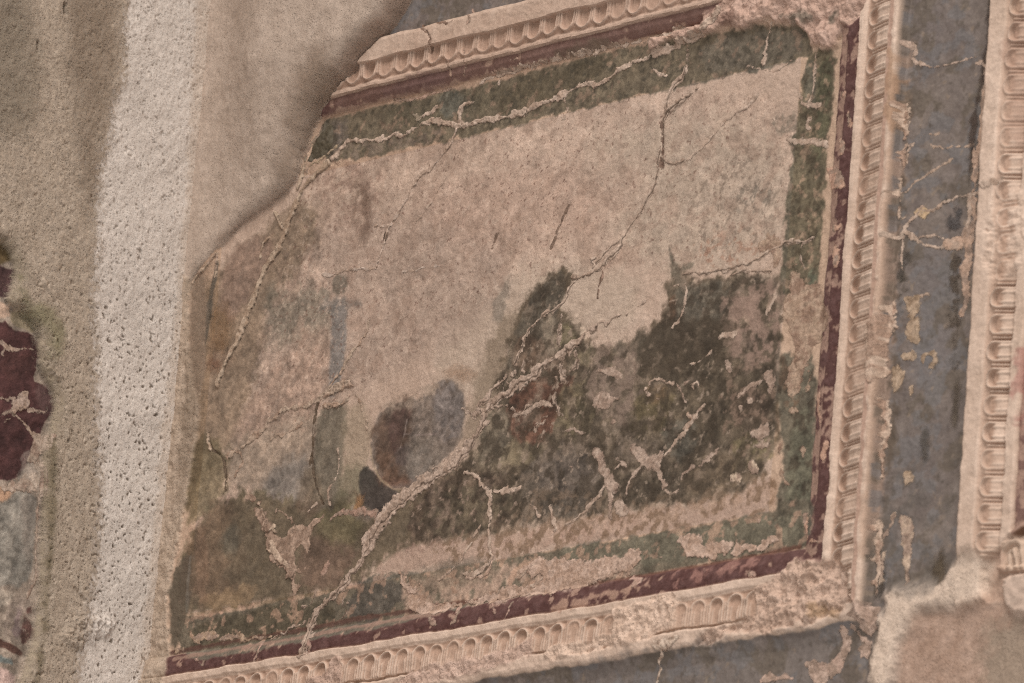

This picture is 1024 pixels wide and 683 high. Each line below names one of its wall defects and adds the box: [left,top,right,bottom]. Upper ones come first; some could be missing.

peeling [826,138,845,190]
peeling [832,245,841,268]
peeling [888,100,911,220]
peeling [958,90,984,317]
crack [206,5,829,658]
peeling [864,295,938,479]
peeling [903,471,914,485]
peeling [398,548,643,626]
peeling [677,533,779,561]
spalling [696,512,915,683]